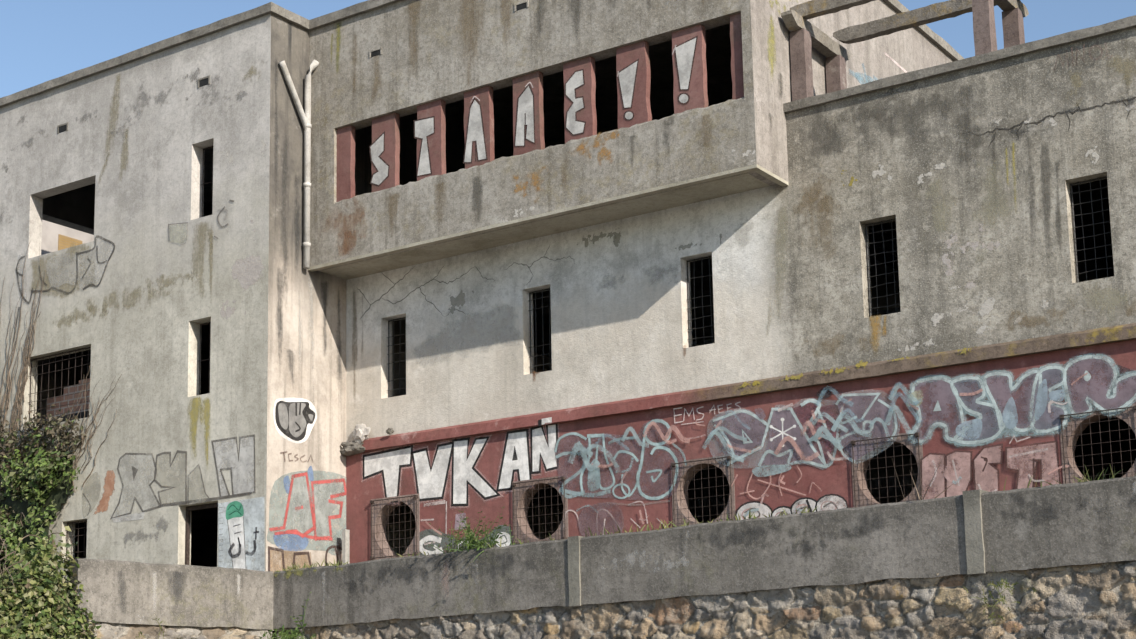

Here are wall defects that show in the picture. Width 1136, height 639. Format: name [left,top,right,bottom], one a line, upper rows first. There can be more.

crack [961,97,1136,146]
water stain [1030,145,1061,237]
crack [357,246,575,319]